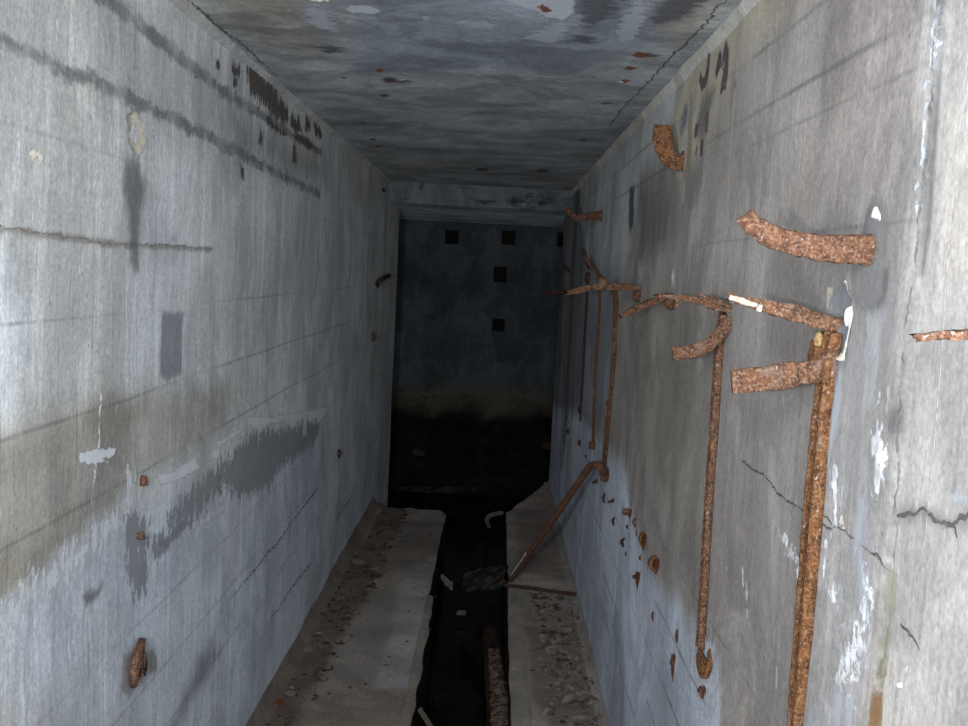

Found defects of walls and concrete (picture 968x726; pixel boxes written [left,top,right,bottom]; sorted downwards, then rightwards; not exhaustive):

leakage [144,26,171,54]
peeling [344,5,381,15]
peeling [504,0,578,45]
leakage [58,66,100,86]
leakage [127,89,165,117]
leakage [194,59,322,164]
leakage [227,146,320,198]
leakage [212,407,328,491]
leakage [822,315,896,726]
crack [893,481,968,538]
crack [743,461,919,675]
corrosion [869,693,883,726]